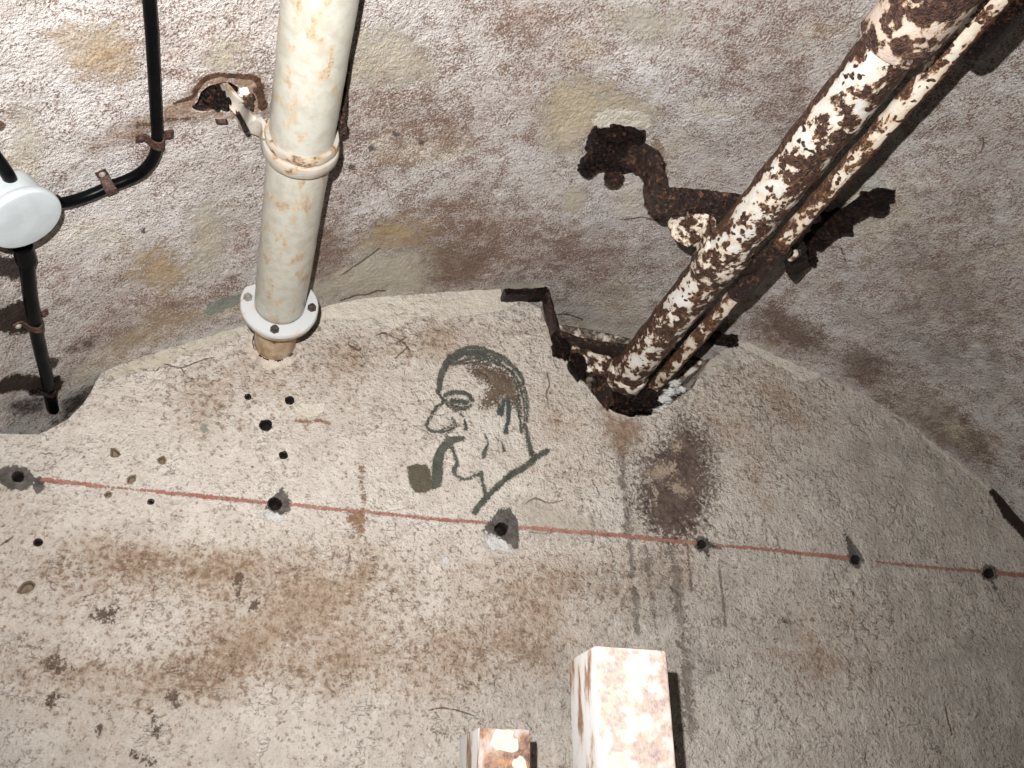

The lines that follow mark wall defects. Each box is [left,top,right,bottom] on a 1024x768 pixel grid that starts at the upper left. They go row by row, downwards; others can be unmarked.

flaking render [192,82,238,112]
damp [626,413,723,592]